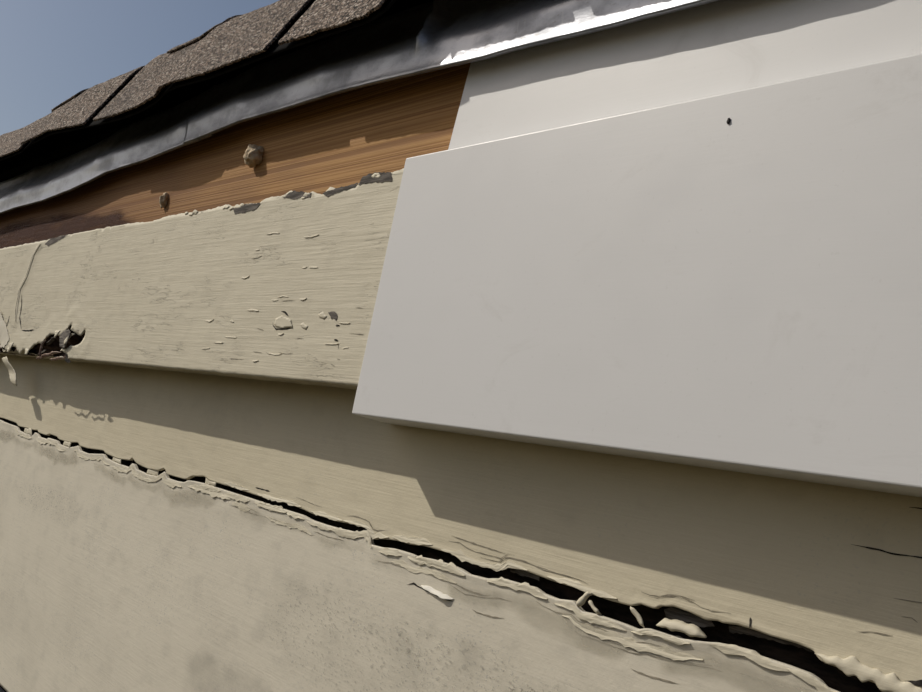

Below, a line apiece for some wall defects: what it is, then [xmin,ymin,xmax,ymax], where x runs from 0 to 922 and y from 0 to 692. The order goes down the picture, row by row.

peeling [282,190,311,199]
peeling [323,172,392,197]
peeling [223,203,260,214]
peeling [257,295,308,339]
peeling [318,311,365,335]
peeling [0,312,17,386]
peeling [59,329,71,363]
crack [0,418,922,692]
peeling [407,582,454,602]